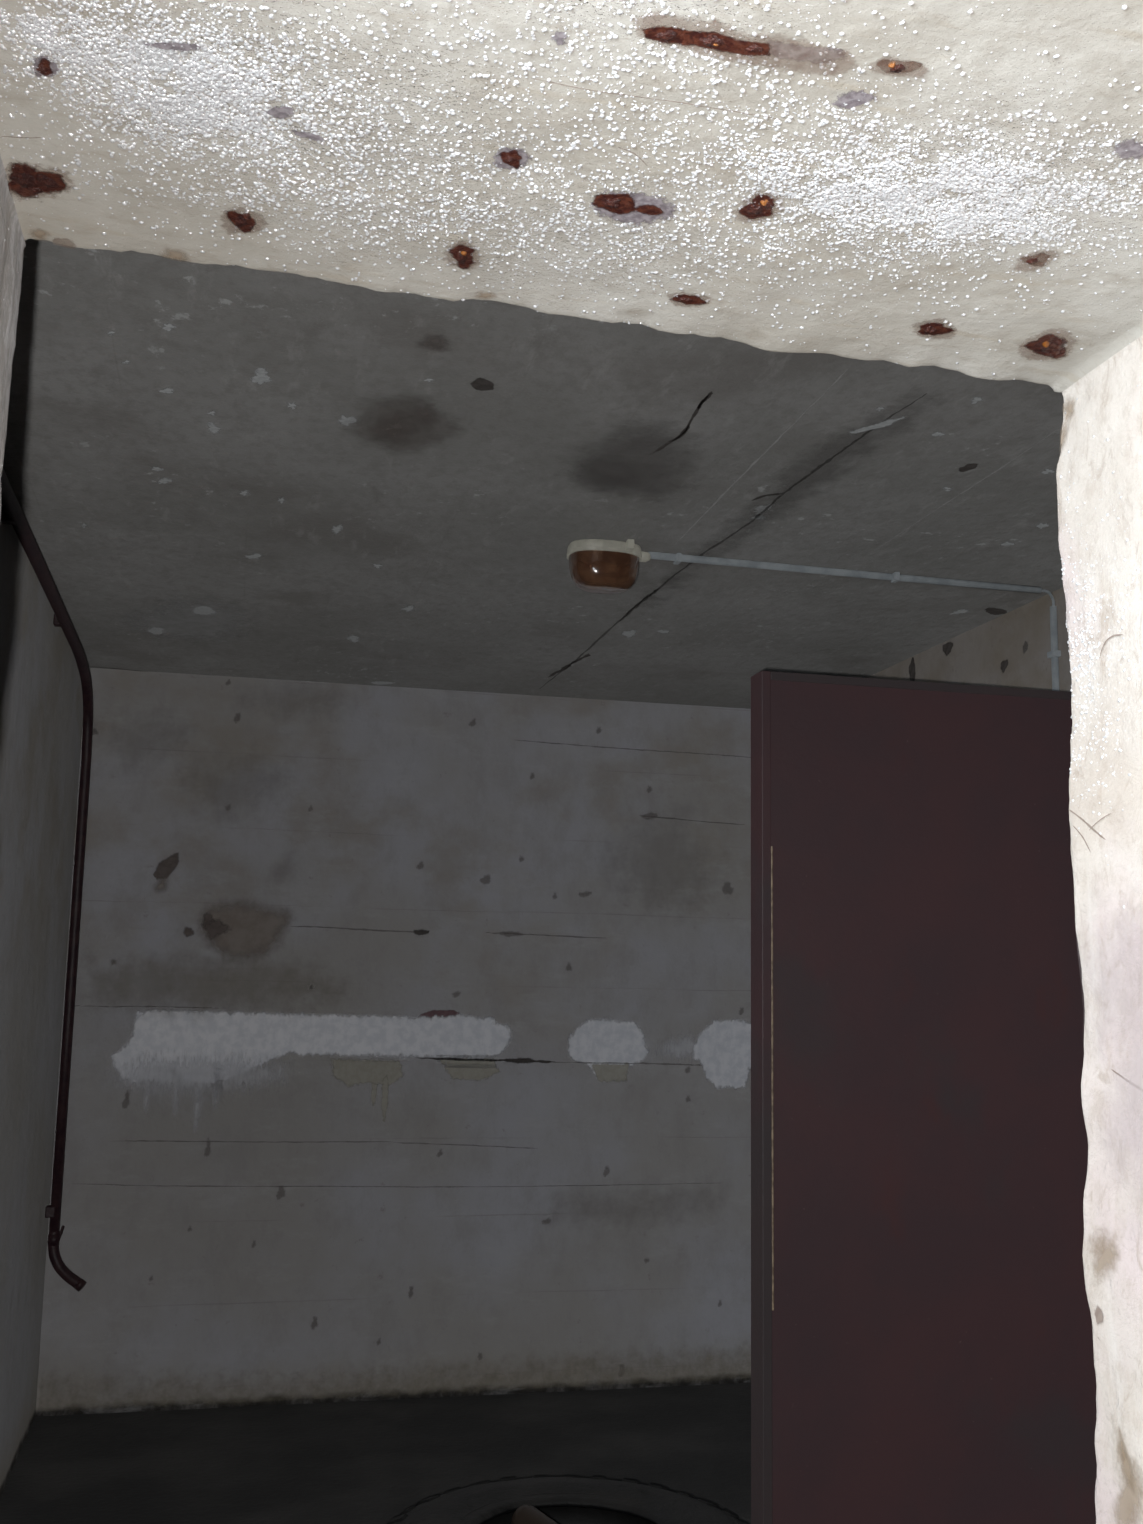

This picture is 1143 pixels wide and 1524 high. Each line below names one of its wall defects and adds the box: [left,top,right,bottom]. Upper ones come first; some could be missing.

corrosion [643,26,846,64]
corrosion [876,59,922,74]
corrosion [493,147,531,170]
corrosion [591,191,676,225]
corrosion [739,195,775,219]
corrosion [227,211,256,233]
corrosion [449,245,474,269]
corrosion [918,323,953,335]
corrosion [1024,334,1068,358]
leakage [360,402,442,448]
crack [541,391,927,688]
leakage [184,903,288,956]